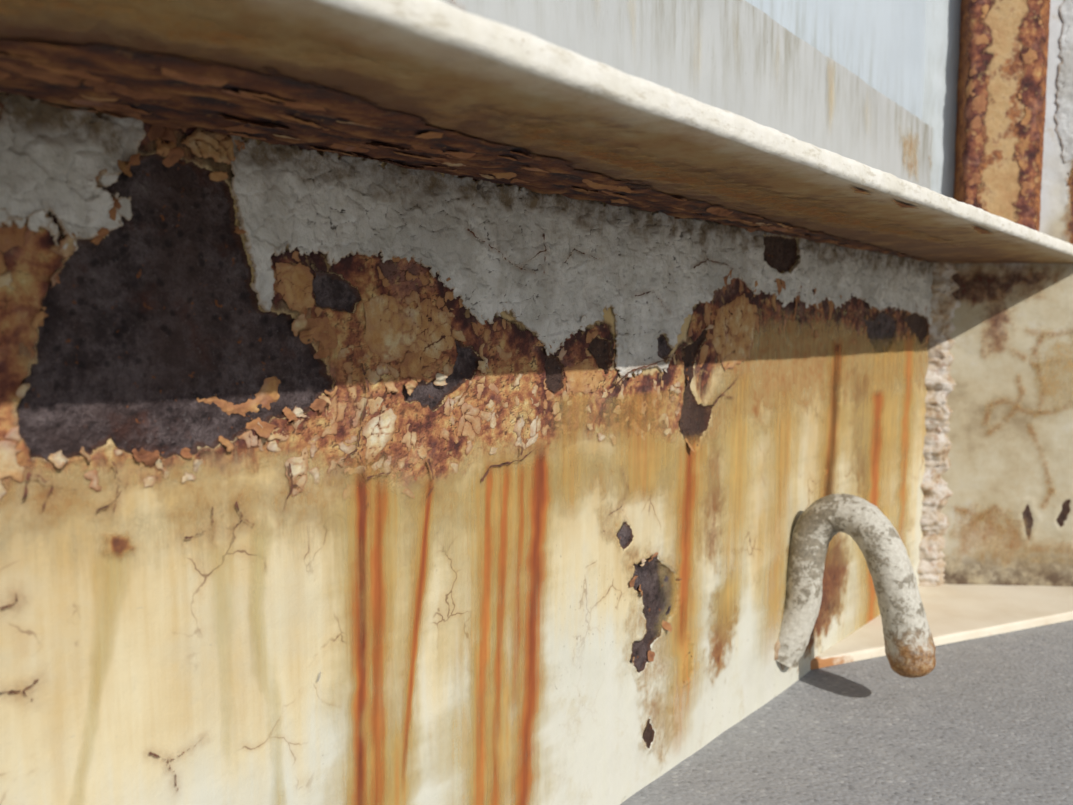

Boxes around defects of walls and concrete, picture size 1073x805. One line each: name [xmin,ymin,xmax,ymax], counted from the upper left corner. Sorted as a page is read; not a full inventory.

peeling [0,61,174,252]
peeling [161,68,934,380]
rust [962,0,995,208]
rust [1012,0,1047,230]
peeling [1054,0,1073,163]
crack [184,501,255,539]
crack [283,463,308,510]
rust [0,123,931,805]
crack [0,679,39,701]
crack [149,740,201,791]